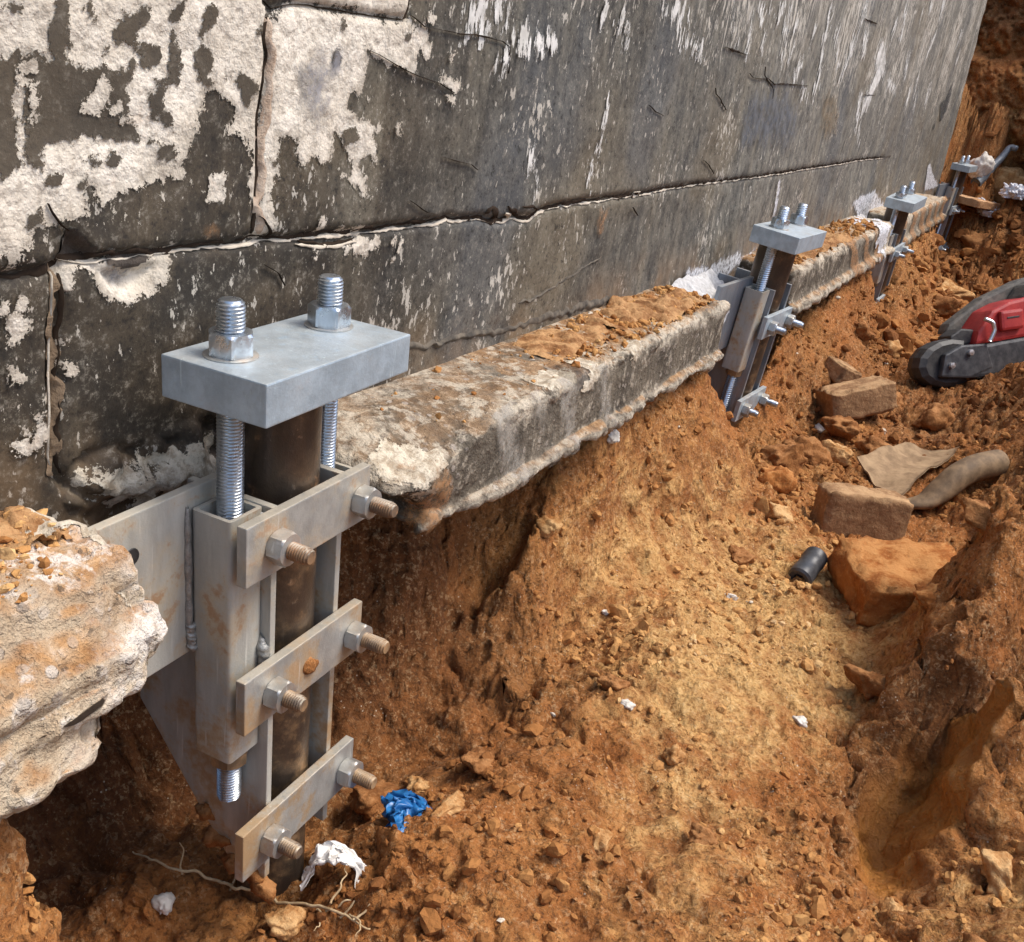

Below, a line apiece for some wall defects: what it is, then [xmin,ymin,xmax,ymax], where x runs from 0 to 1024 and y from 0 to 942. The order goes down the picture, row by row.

peeling [0,0,558,478]
crack [0,0,885,474]
peeling [586,92,613,196]
peeling [731,0,946,143]